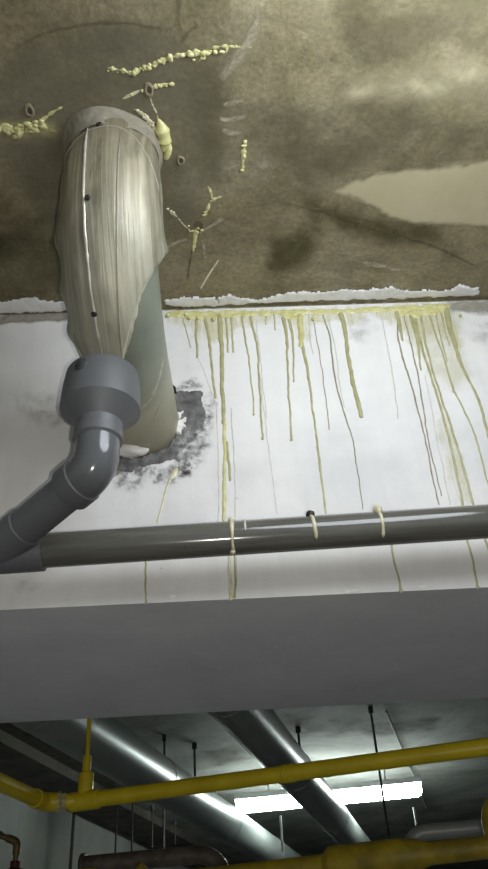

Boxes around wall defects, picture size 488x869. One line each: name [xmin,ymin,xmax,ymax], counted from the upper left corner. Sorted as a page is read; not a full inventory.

leakage [345,63,487,99]
peeling [334,161,488,226]
leakage [311,202,434,241]
leakage [269,234,312,271]
peeling [0,296,67,324]
peeling [164,284,488,313]
leakage [166,304,488,600]